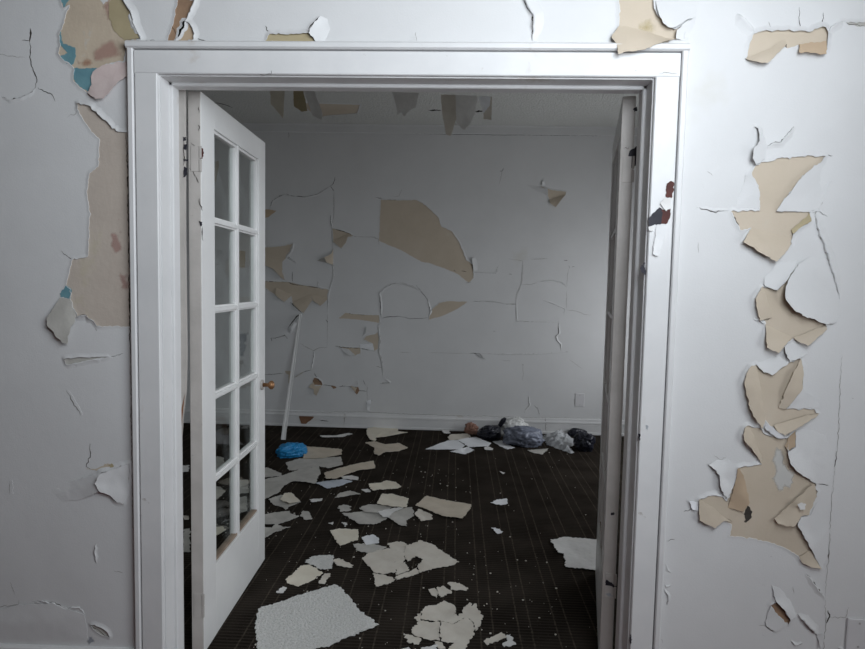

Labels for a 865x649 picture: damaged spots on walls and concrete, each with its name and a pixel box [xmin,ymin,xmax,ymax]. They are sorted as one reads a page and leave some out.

crack [2,29,55,104]
peeling [165,0,205,41]
peeling [609,0,699,54]
peeling [735,10,865,65]
peeling [47,0,147,369]
peeling [265,240,330,313]
crack [265,180,335,371]
crack [376,283,423,384]
peeling [376,197,475,284]
crack [470,257,587,368]
peeling [648,181,674,256]
peeling [685,125,841,572]